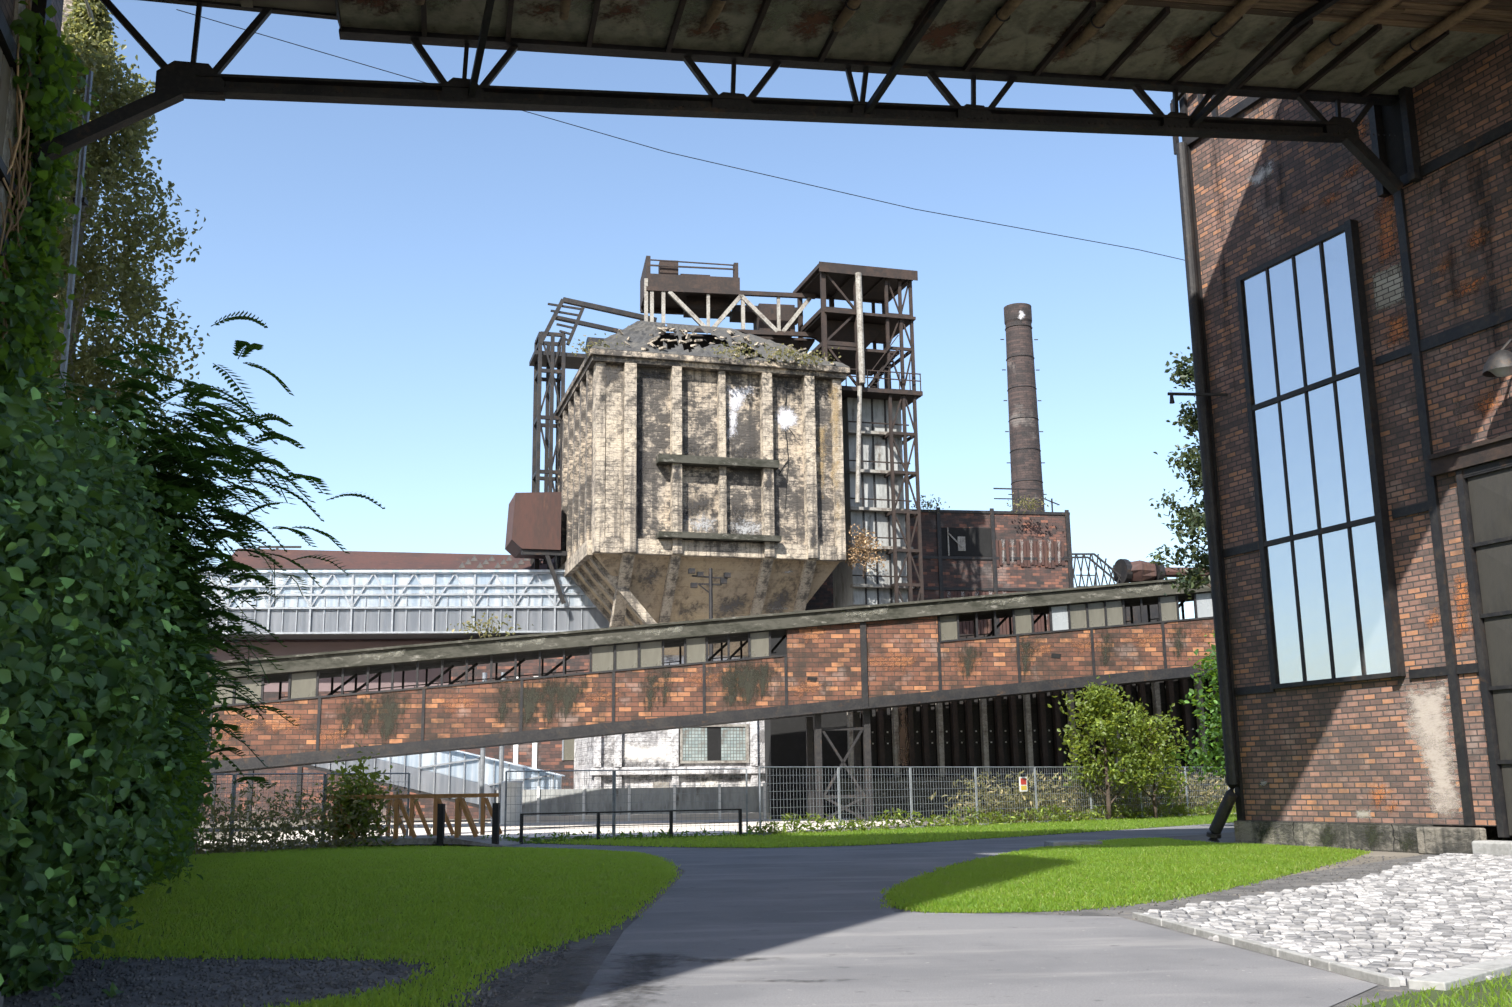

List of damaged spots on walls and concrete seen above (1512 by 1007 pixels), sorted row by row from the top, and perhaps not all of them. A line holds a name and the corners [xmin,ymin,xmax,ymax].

water stain [601,366,622,401]
water stain [774,381,800,400]
water stain [687,494,714,515]
water stain [719,594,748,617]
water stain [766,570,795,613]
efflorescence [1405,685,1462,815]